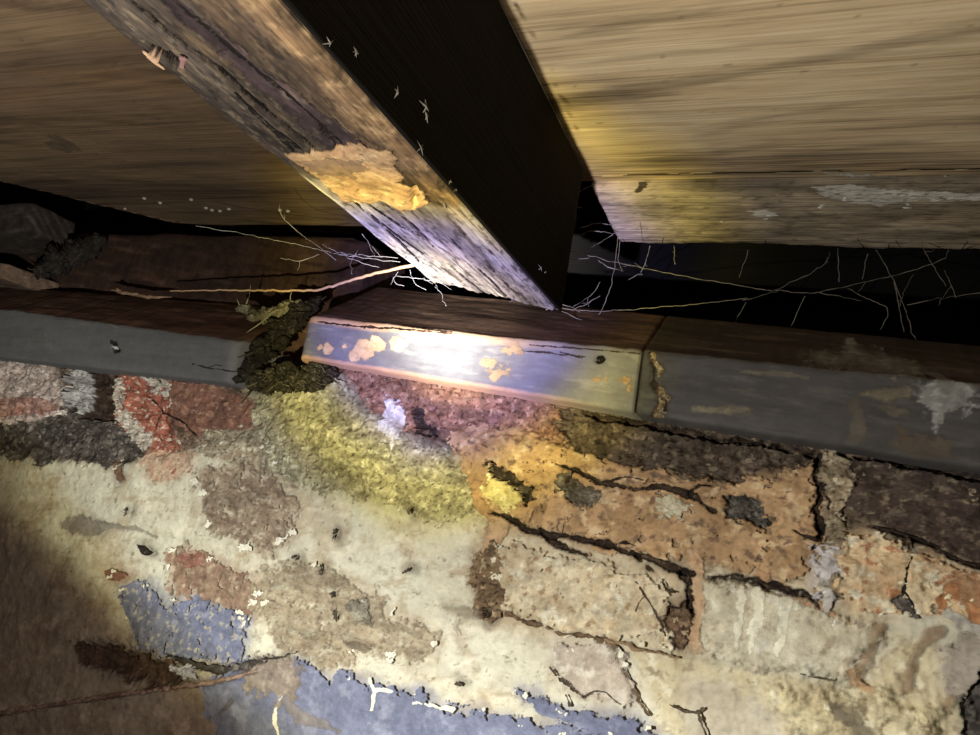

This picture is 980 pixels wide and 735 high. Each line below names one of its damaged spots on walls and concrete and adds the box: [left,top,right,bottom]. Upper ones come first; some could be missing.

crack [146,394,201,441]
corrosion [317,335,409,362]
leakage [376,394,406,455]
corrosion [480,343,524,382]
leakage [692,405,749,414]
leakage [741,338,980,432]
crack [555,463,717,514]
crack [792,453,832,550]
spalling [0,361,980,735]
crack [871,525,980,619]
crack [487,512,820,735]